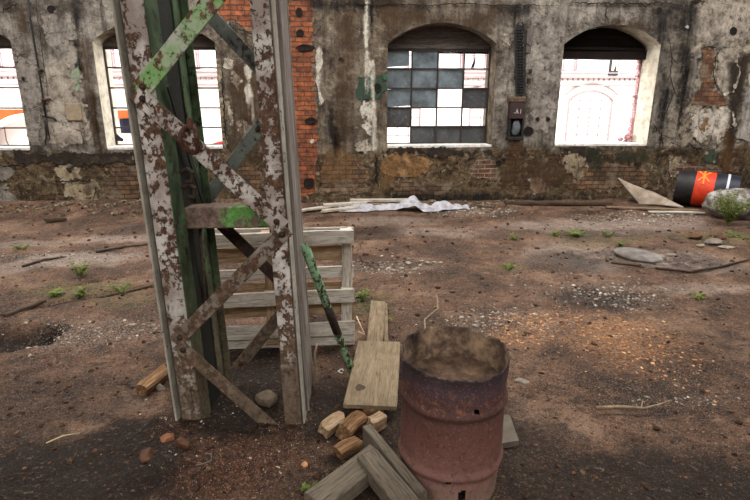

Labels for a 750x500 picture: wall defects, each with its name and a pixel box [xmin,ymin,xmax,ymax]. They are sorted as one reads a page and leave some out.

peeling [0,10,140,201]
peeling [355,75,388,154]
flaking render [380,146,500,199]
peeling [666,0,750,177]